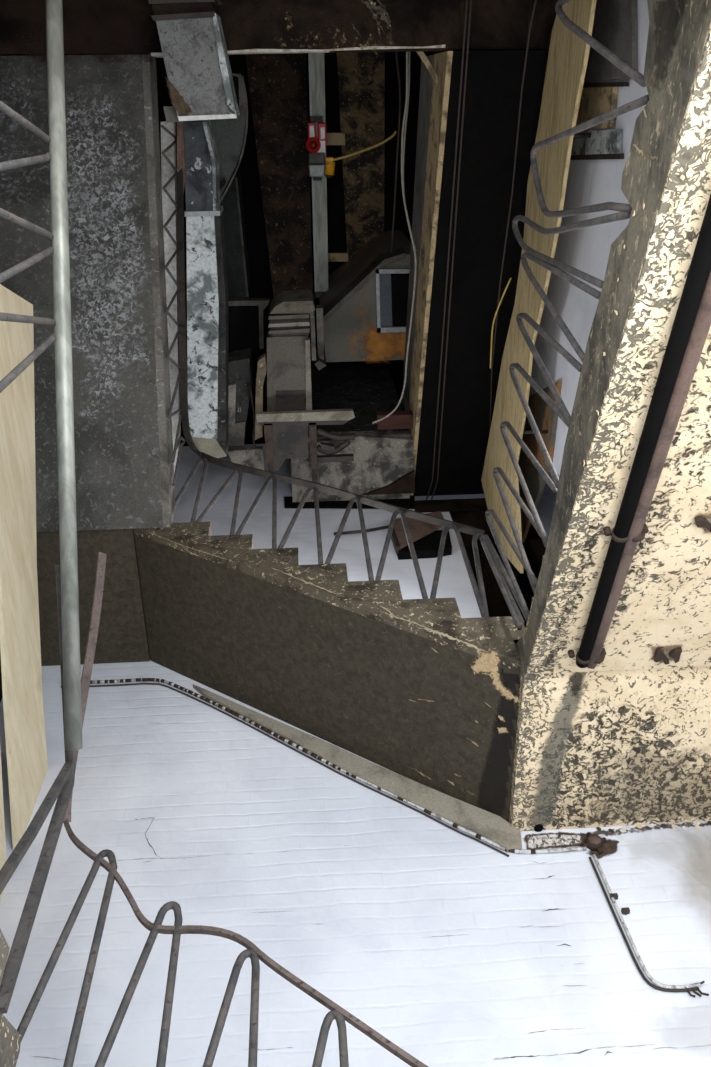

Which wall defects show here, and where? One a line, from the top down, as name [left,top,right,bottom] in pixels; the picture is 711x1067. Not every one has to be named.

rust [365,327,406,361]
peeling [471,651,519,703]
crack [108,817,163,862]
crack [492,1029,710,1060]